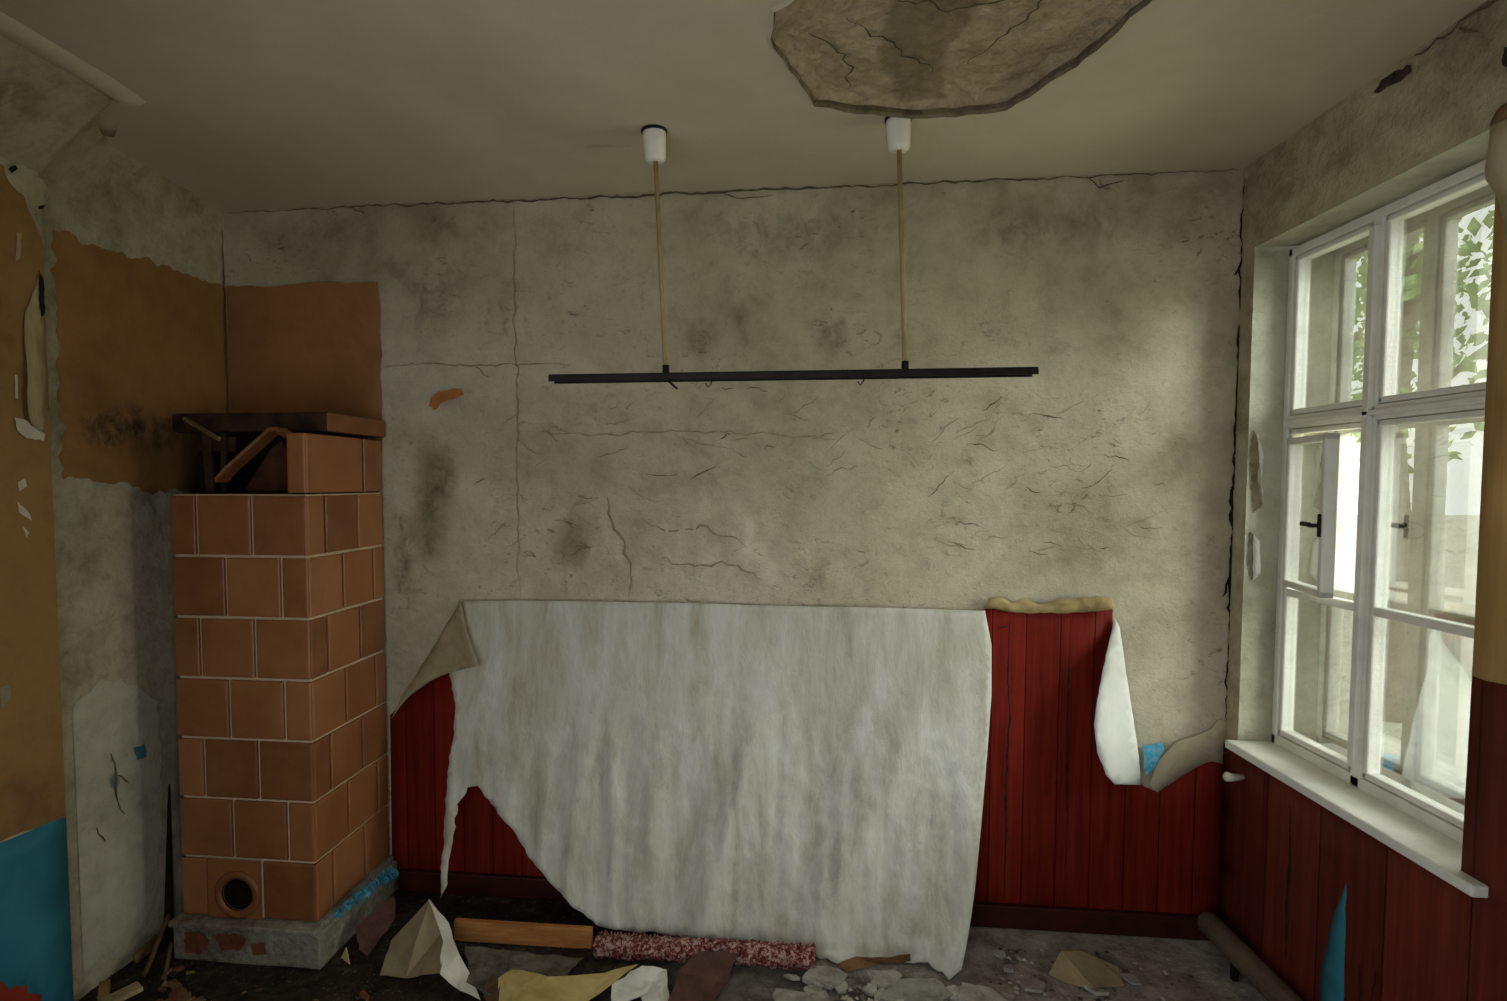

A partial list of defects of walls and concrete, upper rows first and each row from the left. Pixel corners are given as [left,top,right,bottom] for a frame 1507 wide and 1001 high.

crack [1415,0,1498,56]
flaking render [4,164,48,210]
peeling [1485,103,1507,243]
peeling [17,479,32,537]
peeling [1143,743,1164,776]